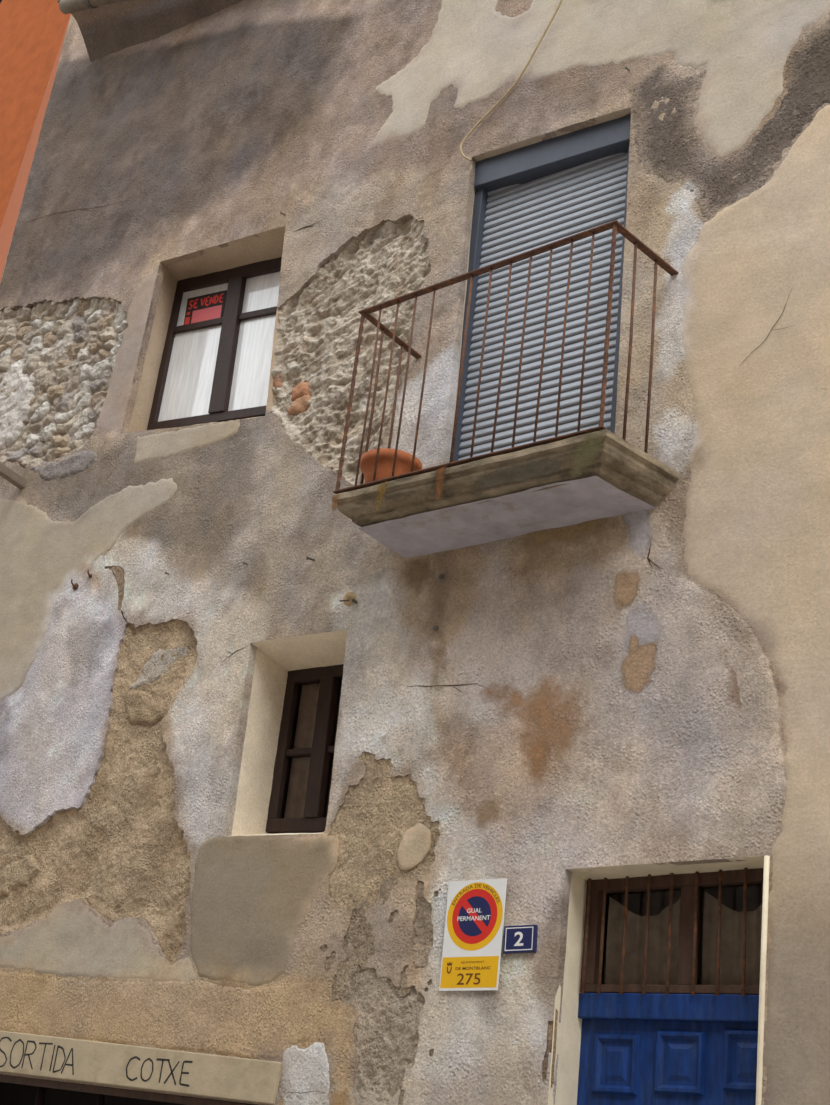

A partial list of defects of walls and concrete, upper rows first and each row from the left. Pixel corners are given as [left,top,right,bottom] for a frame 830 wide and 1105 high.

flaking render [627,19,830,218]
flaking render [615,571,640,609]
flaking render [621,635,656,692]
flaking render [0,619,198,963]
flaking render [321,751,441,1105]